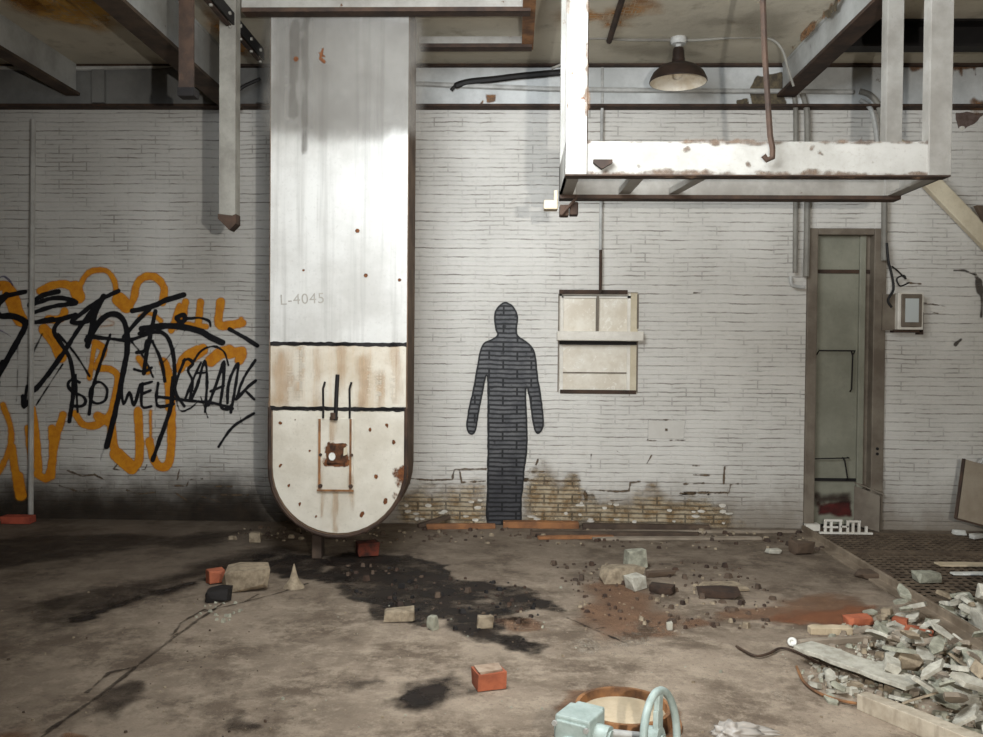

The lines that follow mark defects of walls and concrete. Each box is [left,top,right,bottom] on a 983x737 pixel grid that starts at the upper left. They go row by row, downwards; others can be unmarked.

spalling [956,112,983,131]
corrosion [684,139,781,150]
corrosion [383,465,408,504]
peeling [401,486,483,523]
peeling [527,476,733,526]
leakage [0,485,257,566]